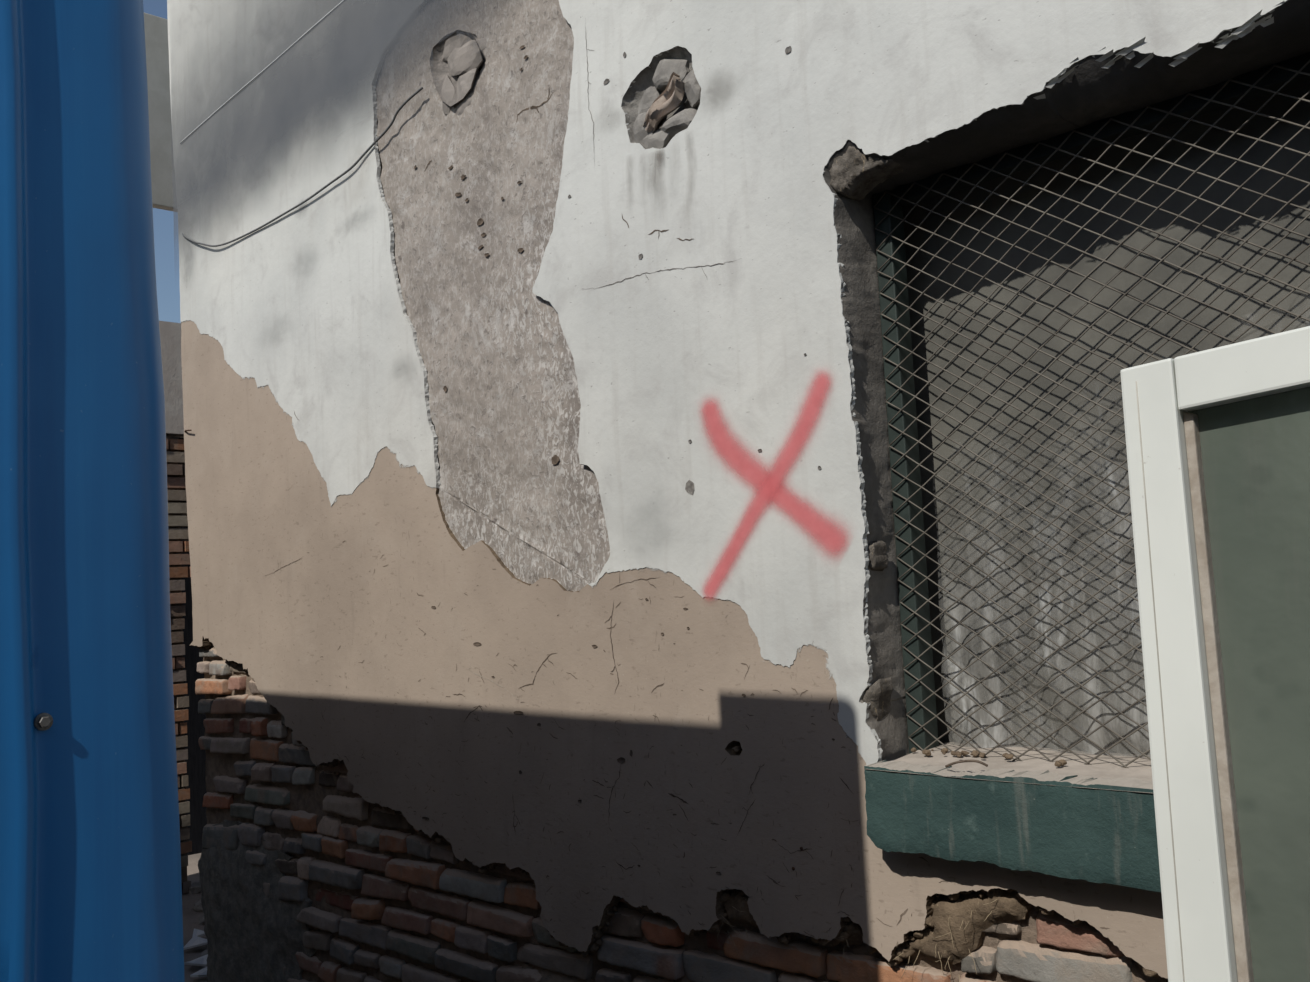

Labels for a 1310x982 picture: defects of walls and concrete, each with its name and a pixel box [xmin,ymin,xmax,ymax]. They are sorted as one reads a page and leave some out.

flaking render [1168,1,1284,67]
crack [583,216,733,290]
peeling [181,0,1168,982]
crack [292,575,912,944]